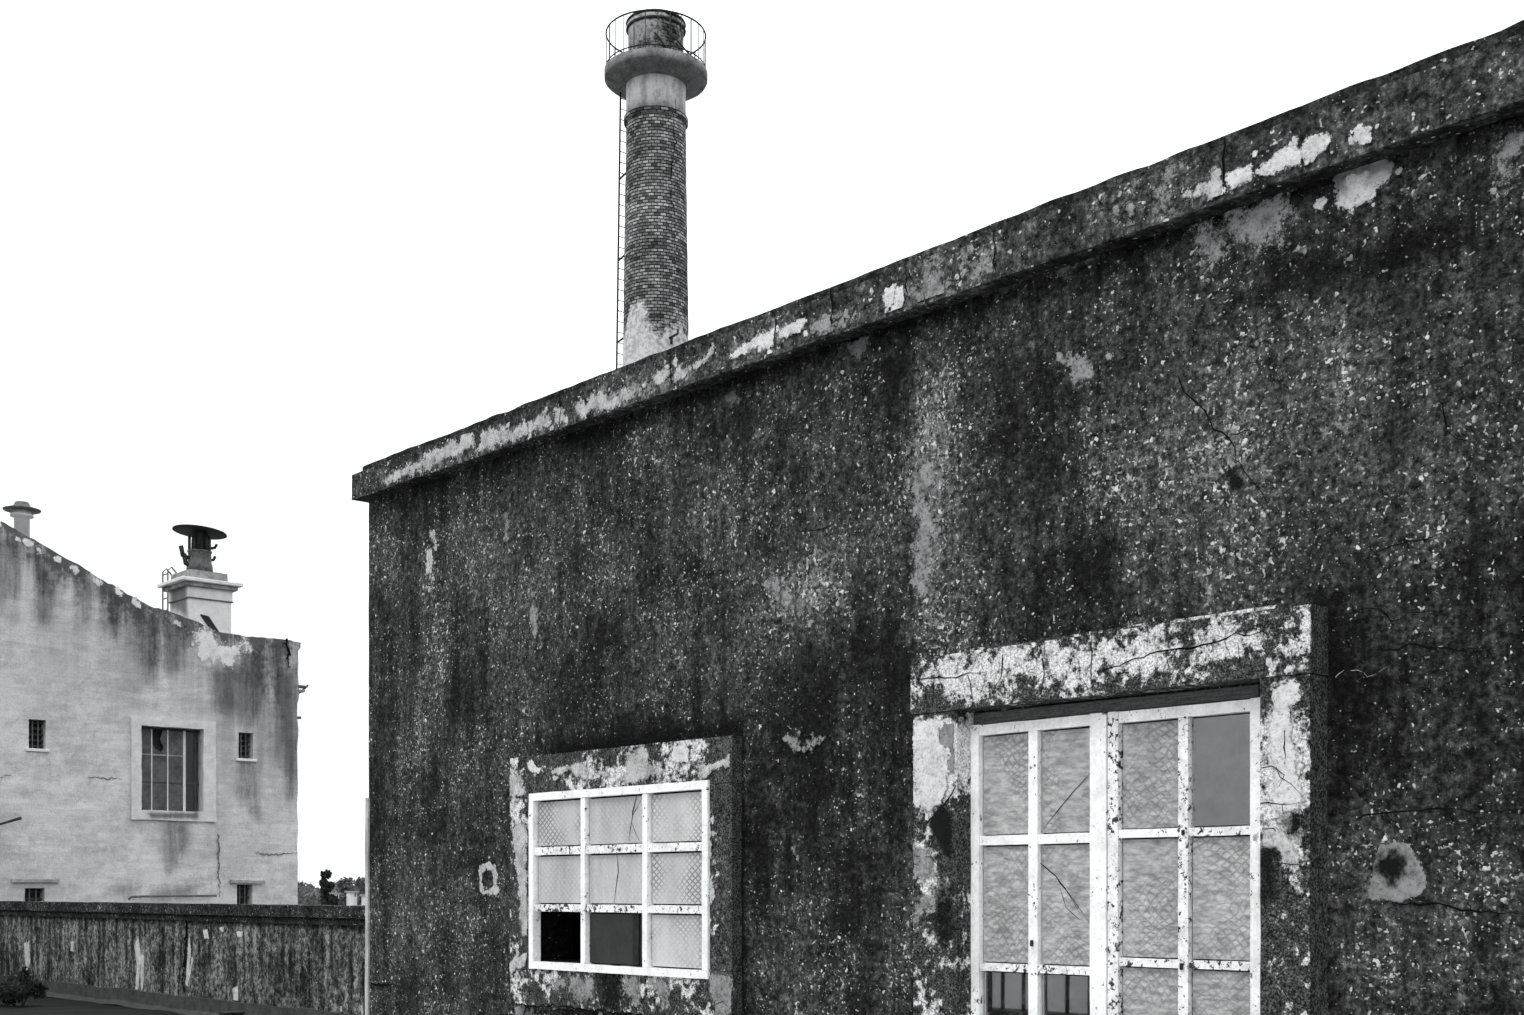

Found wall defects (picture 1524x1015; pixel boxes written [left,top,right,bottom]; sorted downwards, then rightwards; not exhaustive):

spalling [1182,123,1403,283]
peeling [373,307,870,493]
damp [172,587,185,613]
damp [275,660,296,787]
spalling [478,861,500,896]
peeling [510,741,730,806]
damp [546,723,744,1015]
peeling [912,717,954,925]
peeling [1253,657,1309,866]
spalling [1367,840,1429,903]
damp [134,938,144,990]
damp [185,927,243,986]